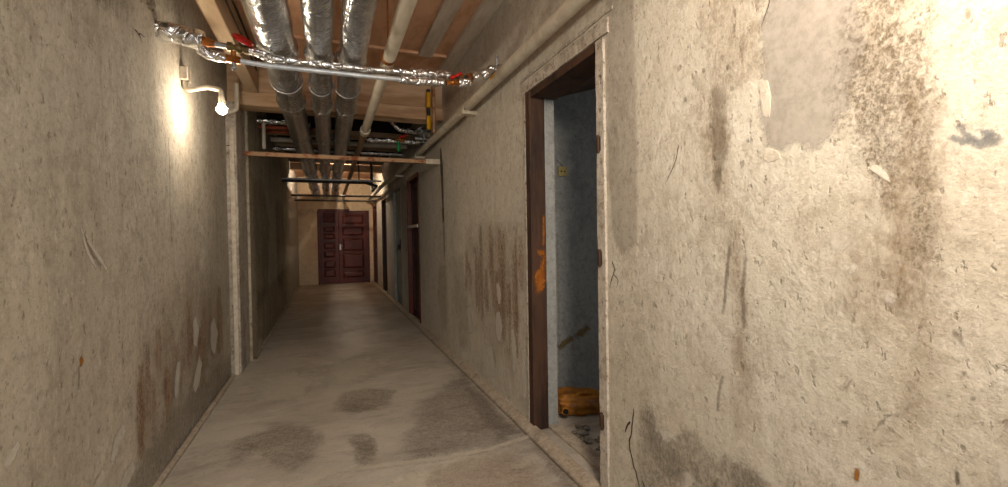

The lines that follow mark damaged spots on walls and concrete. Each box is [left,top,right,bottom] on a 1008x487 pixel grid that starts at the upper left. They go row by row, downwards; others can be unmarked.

flaking render [759,0,866,162]
rust [138,304,222,456]